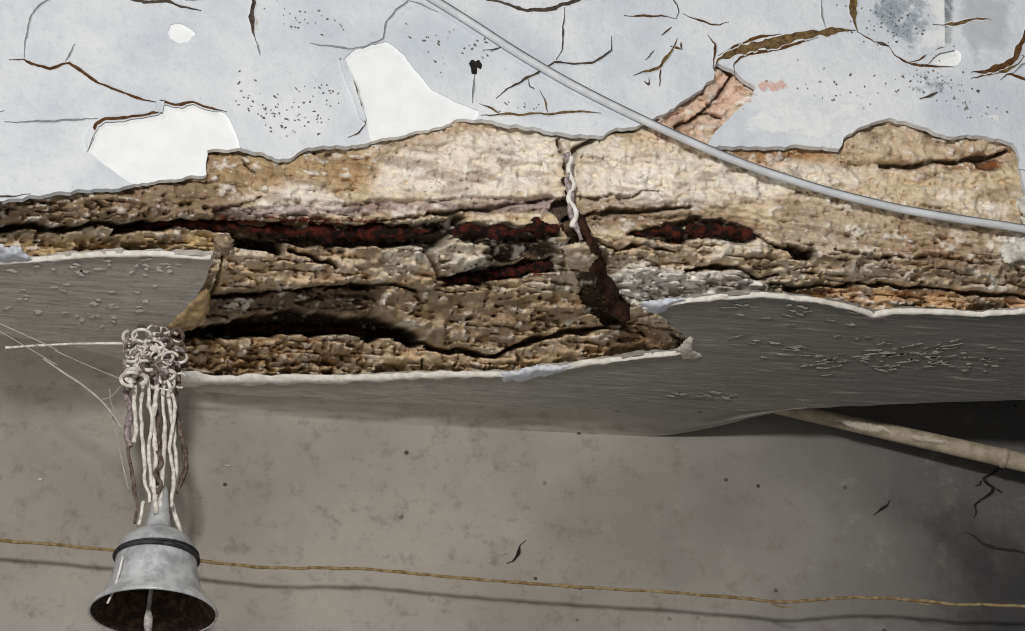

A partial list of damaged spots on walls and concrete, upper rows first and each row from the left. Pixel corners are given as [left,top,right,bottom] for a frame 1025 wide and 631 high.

crack [0,0,227,152]
peeling [168,24,195,43]
crack [246,0,261,55]
crack [310,0,438,138]
crack [479,0,1025,117]
peeling [861,0,925,50]
crack [0,192,31,200]
corrosion [112,215,431,250]
spalling [0,38,1025,387]
corrosion [635,221,757,244]
corrosion [188,321,408,341]
crack [965,466,1025,555]